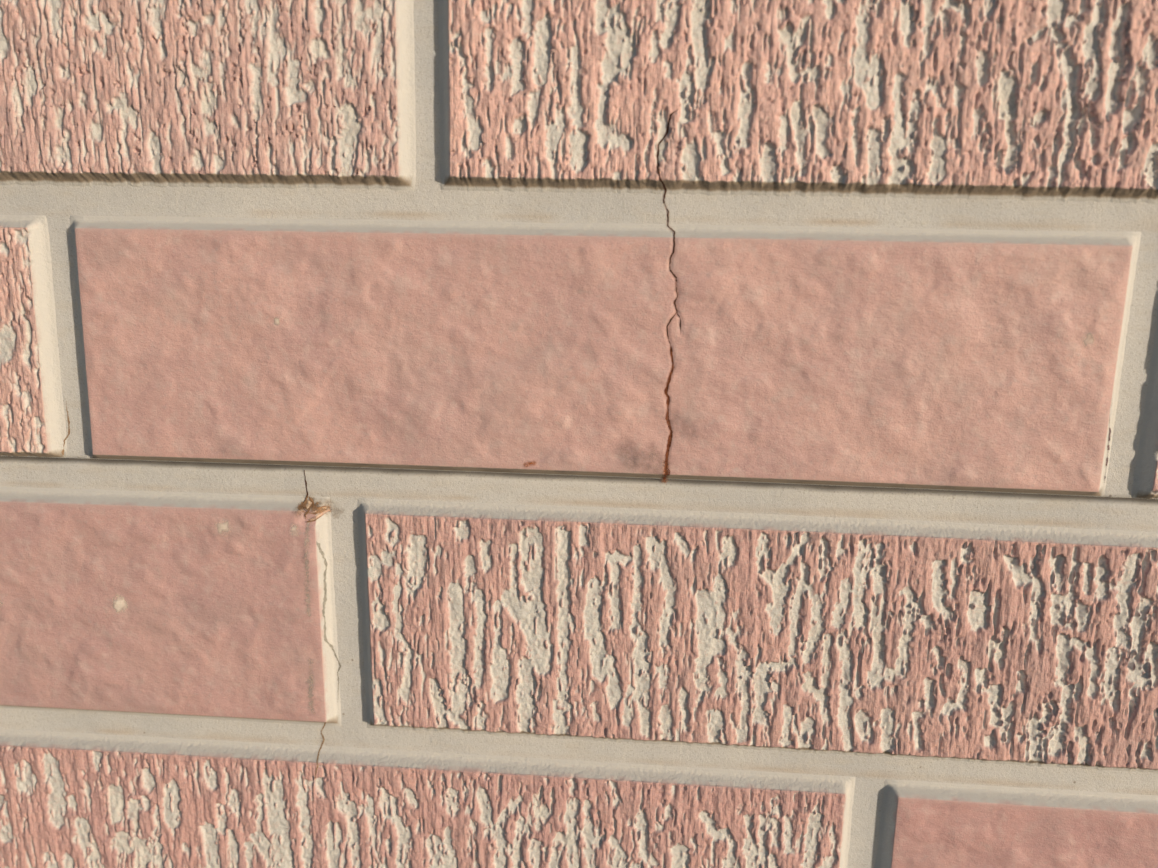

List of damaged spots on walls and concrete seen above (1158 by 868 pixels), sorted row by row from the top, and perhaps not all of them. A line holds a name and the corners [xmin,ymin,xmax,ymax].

crack [657,109,681,480]
crack [315,541,341,782]